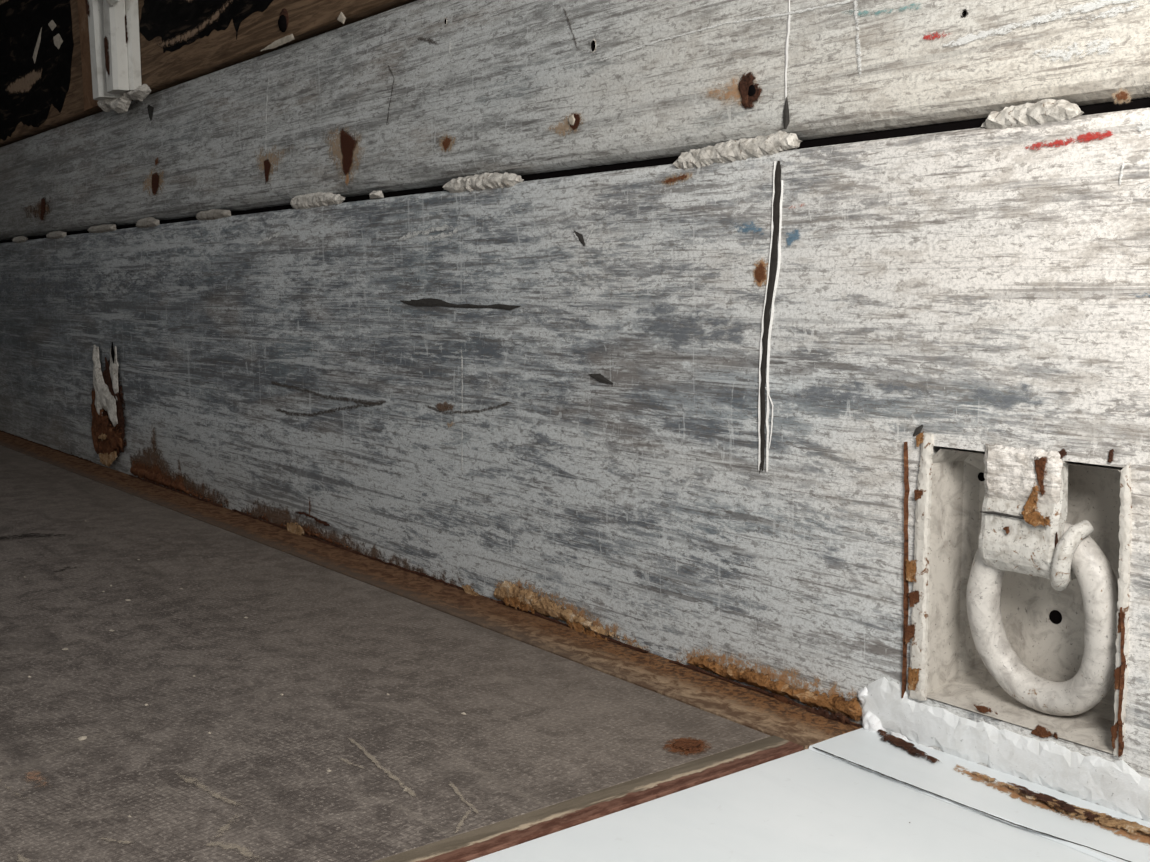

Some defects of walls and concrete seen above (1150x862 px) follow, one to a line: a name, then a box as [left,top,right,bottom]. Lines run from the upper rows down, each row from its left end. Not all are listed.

peeling [0,0,74,141]
peeling [125,0,273,53]
rust [709,72,762,109]
crack [783,0,791,129]
rust [325,128,362,185]
crack [758,161,783,474]
peeling [98,433,117,467]
rust [901,442,910,698]
rust [878,729,939,763]
rust [954,765,1150,844]